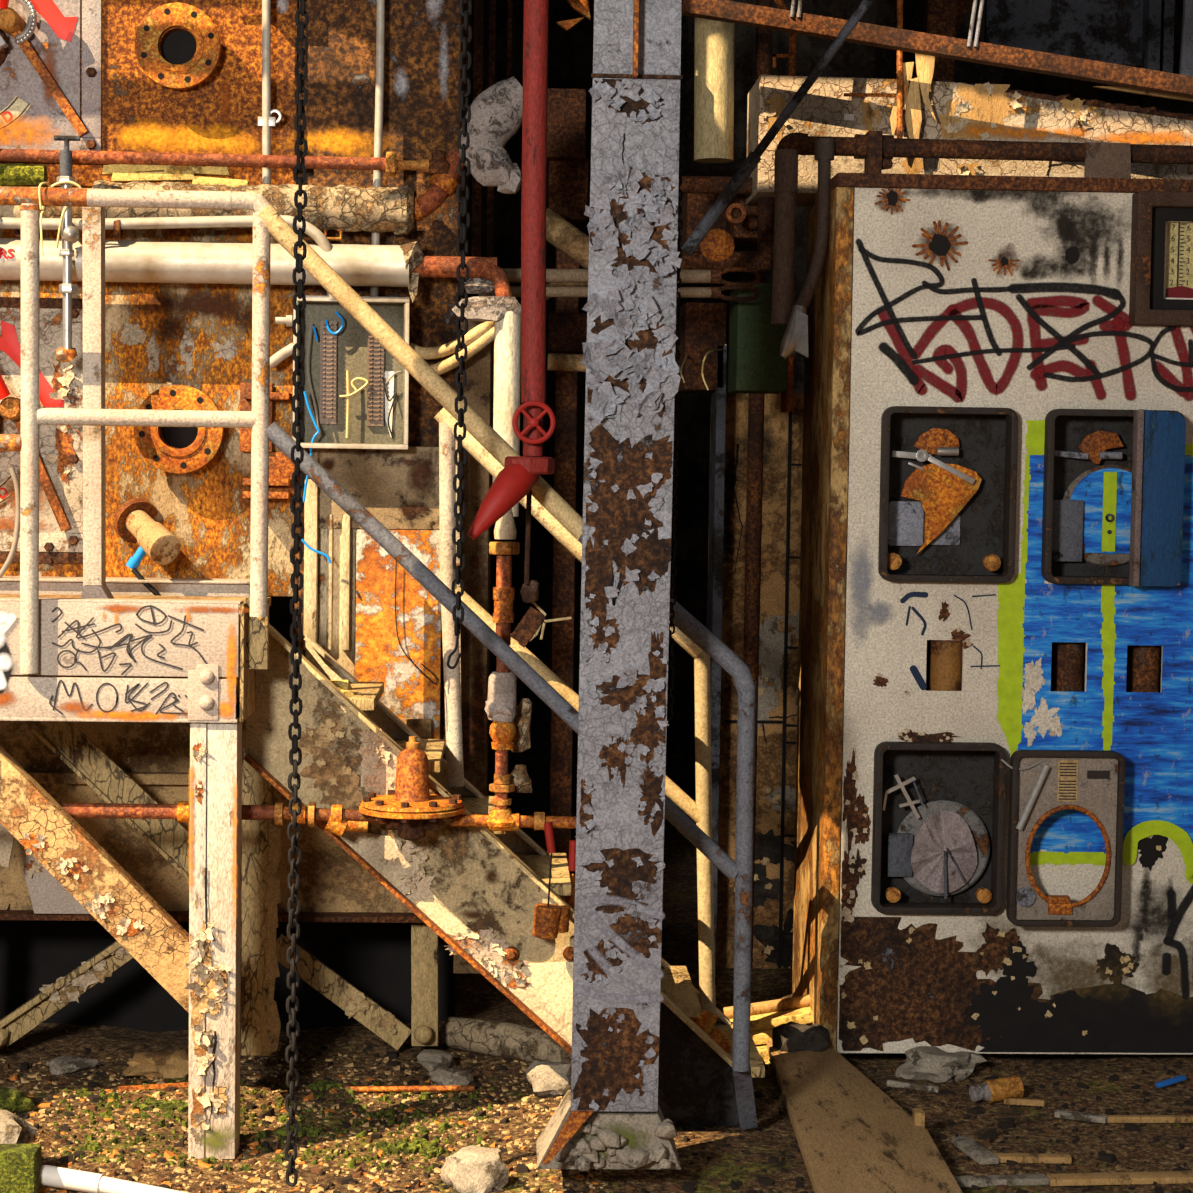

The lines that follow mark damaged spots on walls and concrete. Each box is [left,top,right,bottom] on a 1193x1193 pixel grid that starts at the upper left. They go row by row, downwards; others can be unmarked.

rust [121,121,254,151]
rust [305,131,366,153]
peeling [589,78,665,124]
crack [1046,121,1094,176]
rust [134,292,252,339]
peeling [579,164,682,663]
peeling [587,631,669,836]
peeling [1021,657,1062,747]
peeling [575,779,665,985]
spalling [0,891,231,1144]
spalling [274,922,425,1034]
spalling [1096,943,1139,984]